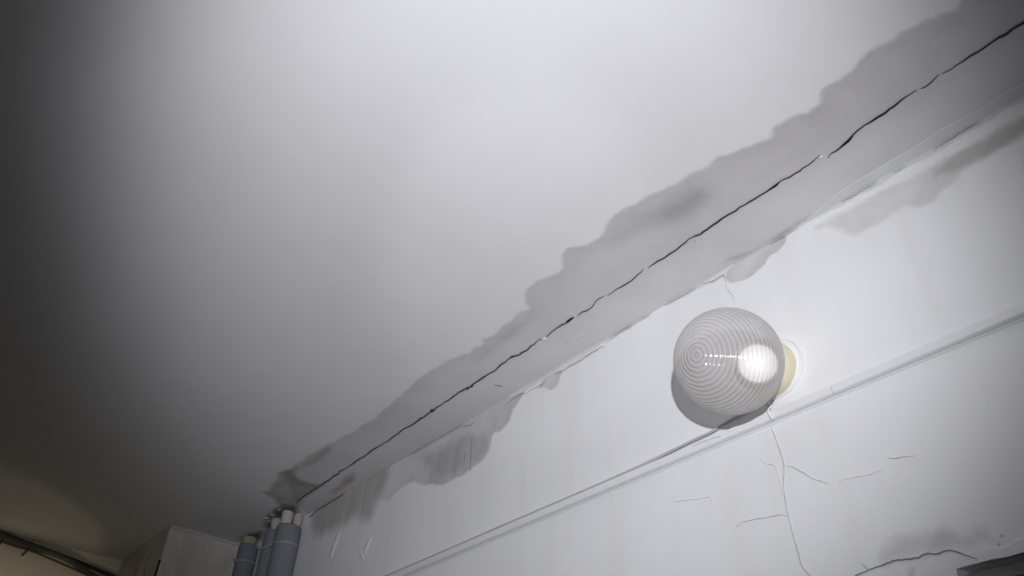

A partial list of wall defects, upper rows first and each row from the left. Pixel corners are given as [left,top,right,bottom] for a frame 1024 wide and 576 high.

crack [296,21,1024,518]
crack [734,426,916,576]